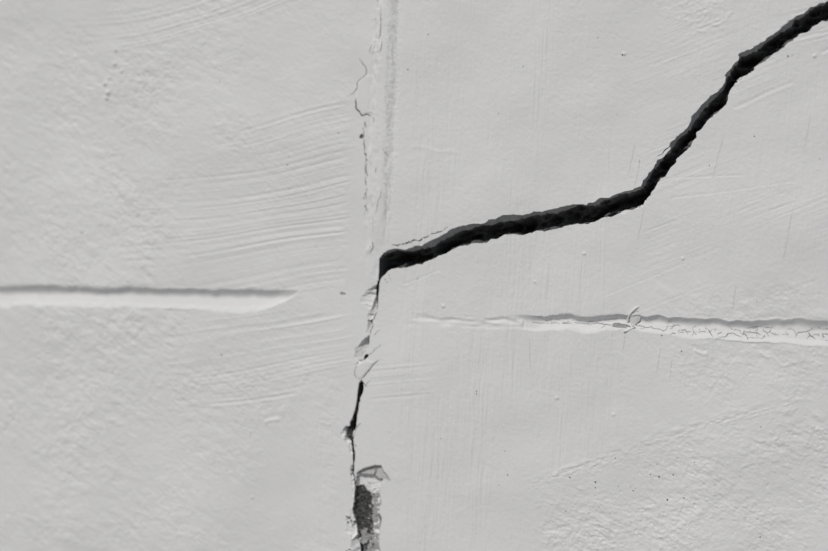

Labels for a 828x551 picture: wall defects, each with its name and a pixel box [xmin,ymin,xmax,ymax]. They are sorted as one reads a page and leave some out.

peeling [354,285,378,379]
crack [350,0,828,551]
spalling [340,426,390,551]